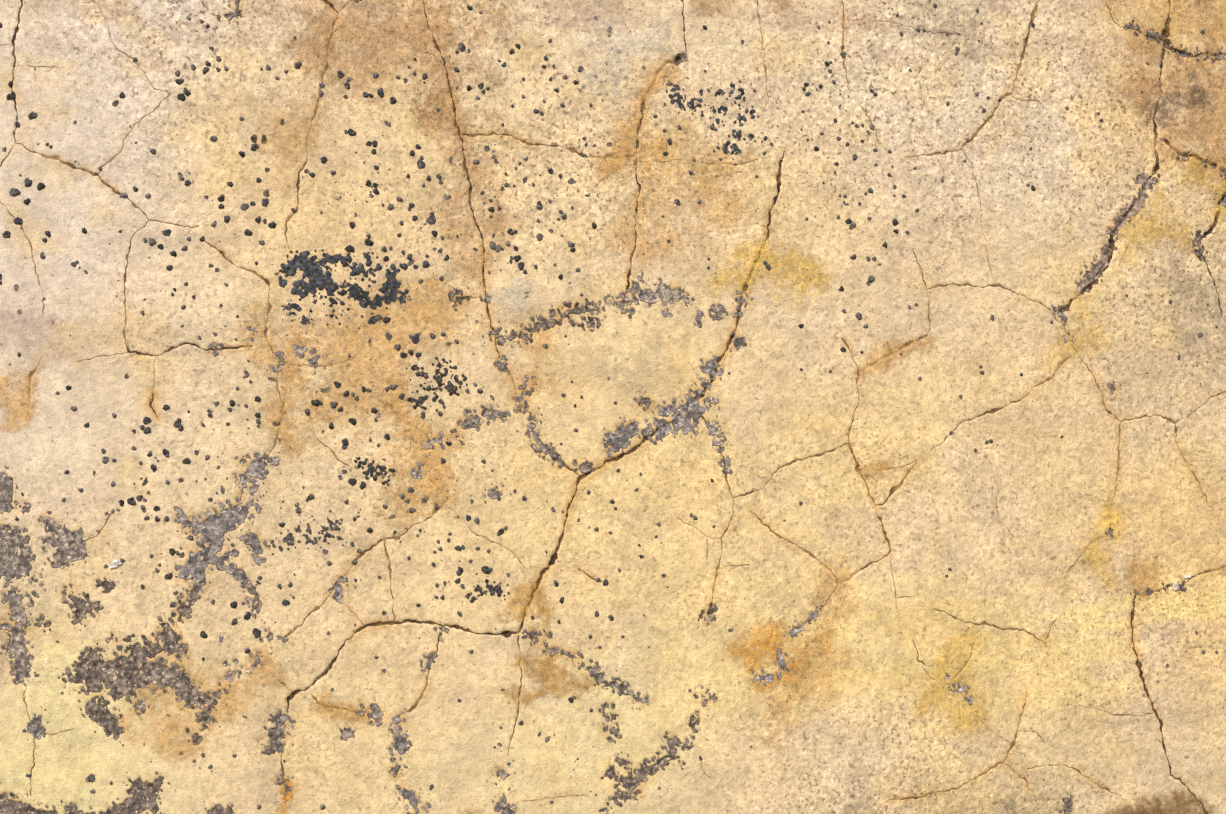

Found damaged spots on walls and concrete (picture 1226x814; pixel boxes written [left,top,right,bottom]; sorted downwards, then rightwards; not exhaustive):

crack [0,0,358,505]
crack [266,0,1226,754]
crack [23,690,72,796]
crack [280,752,288,807]
crack [523,795,614,814]
crack [889,692,1121,800]
crack [1068,566,1226,814]